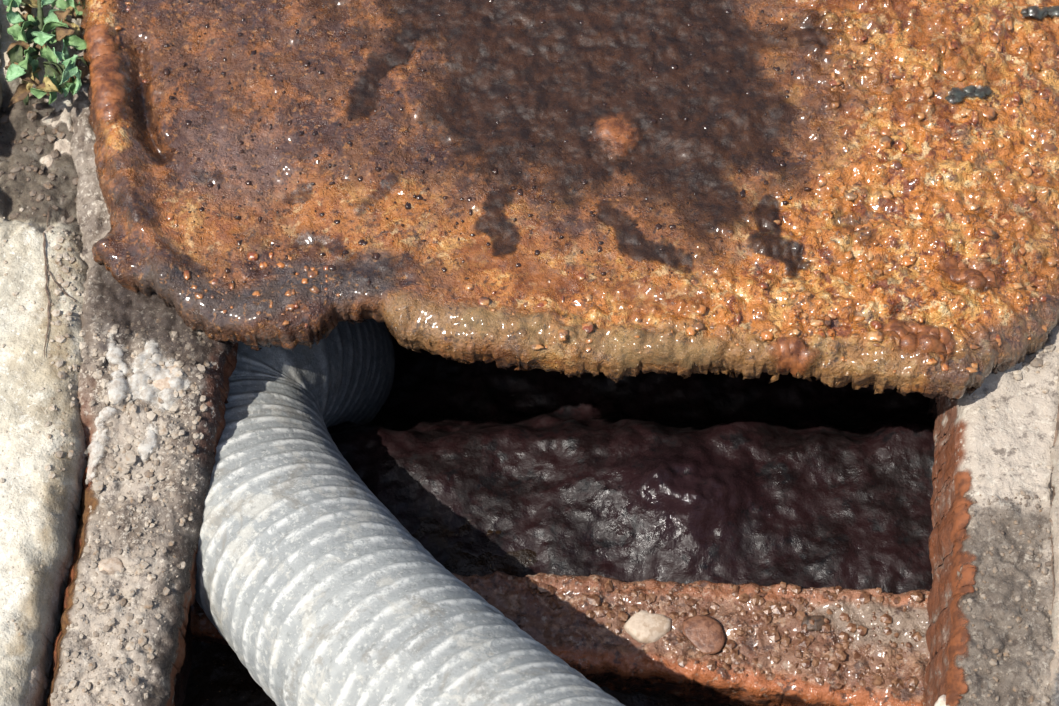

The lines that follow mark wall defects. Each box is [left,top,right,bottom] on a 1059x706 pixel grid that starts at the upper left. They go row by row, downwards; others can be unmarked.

rust [46,489,98,706]
rust [944,471,976,706]